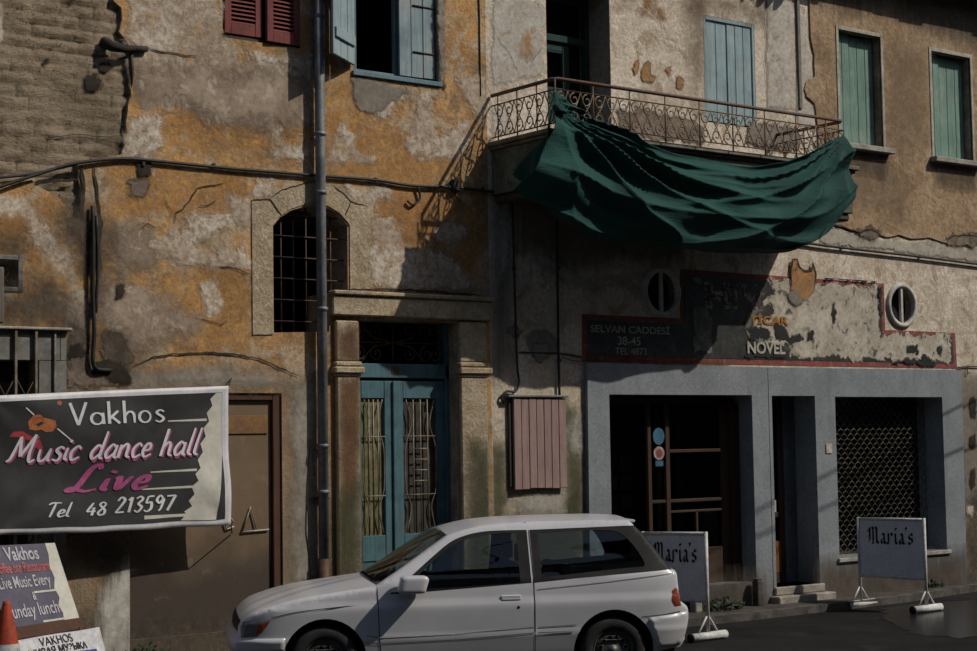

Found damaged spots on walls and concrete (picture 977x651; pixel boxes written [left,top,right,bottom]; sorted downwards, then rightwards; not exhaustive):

spalling [633,59,684,89]
spalling [0,0,315,388]
crack [141,183,224,229]
peeling [325,0,544,292]
crack [130,352,300,377]
peeling [743,260,953,367]
leakage [823,377,977,597]